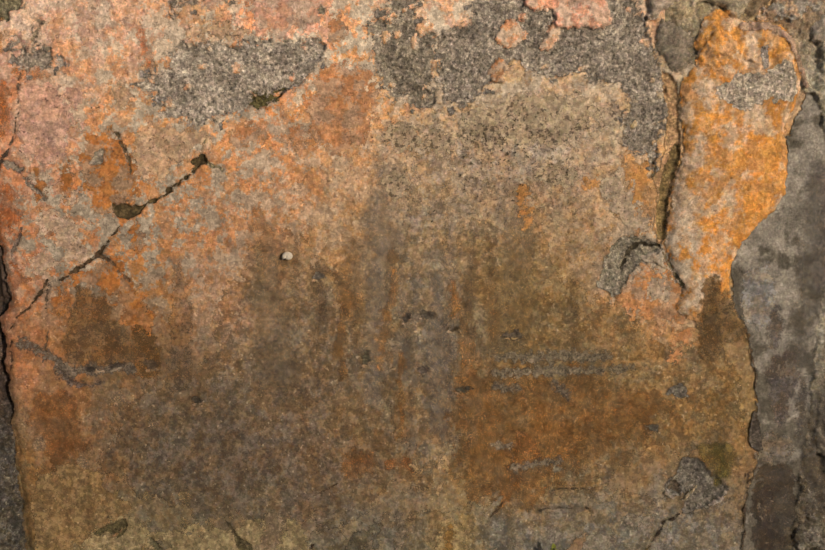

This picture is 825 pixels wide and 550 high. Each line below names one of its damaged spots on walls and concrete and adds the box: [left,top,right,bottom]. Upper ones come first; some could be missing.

crack [0,72,47,201]
spalling [0,0,695,364]
crack [9,129,224,370]
crack [645,513,680,550]
spalling [664,456,729,516]